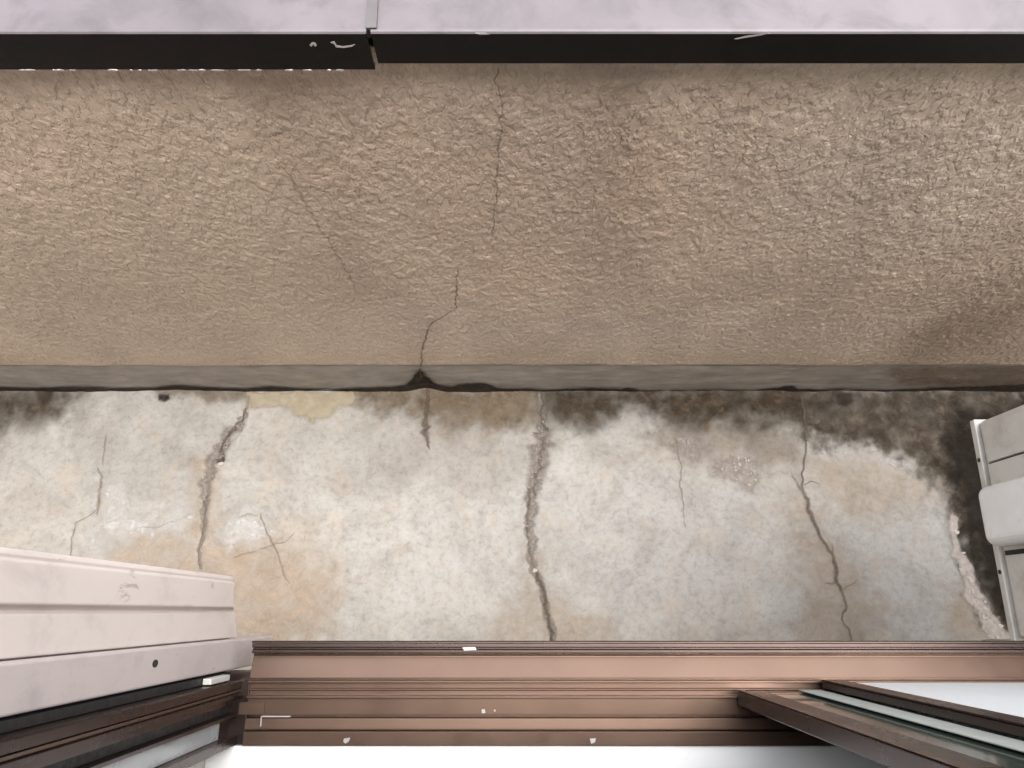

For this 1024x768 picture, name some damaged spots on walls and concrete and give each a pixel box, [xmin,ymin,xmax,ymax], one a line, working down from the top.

crack [0,271,1024,641]
damp [357,367,1024,633]
peeling [949,513,1010,639]